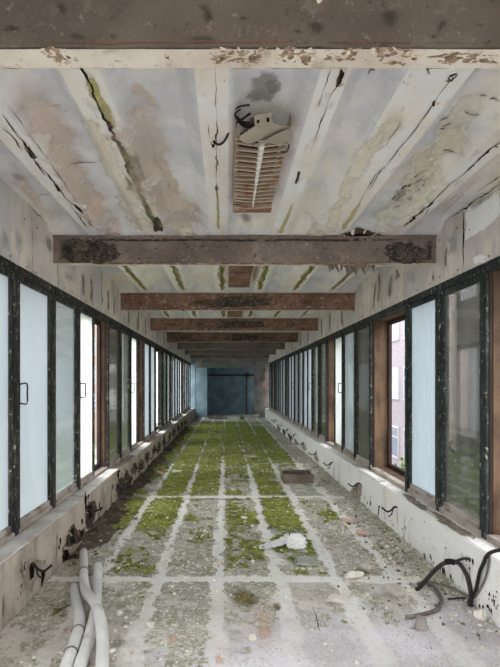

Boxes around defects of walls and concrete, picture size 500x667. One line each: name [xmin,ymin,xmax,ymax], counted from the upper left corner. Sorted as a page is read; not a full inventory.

peeling [41,46,71,64]
peeling [207,46,417,87]
peeling [427,50,498,65]
crack [2,106,98,227]
crack [80,68,121,148]
crack [208,70,219,210]
crack [311,70,337,150]
crack [356,82,449,208]
water stain [376,101,479,224]
crack [404,143,499,226]
spalling [341,228,383,236]
spalling [59,491,101,562]